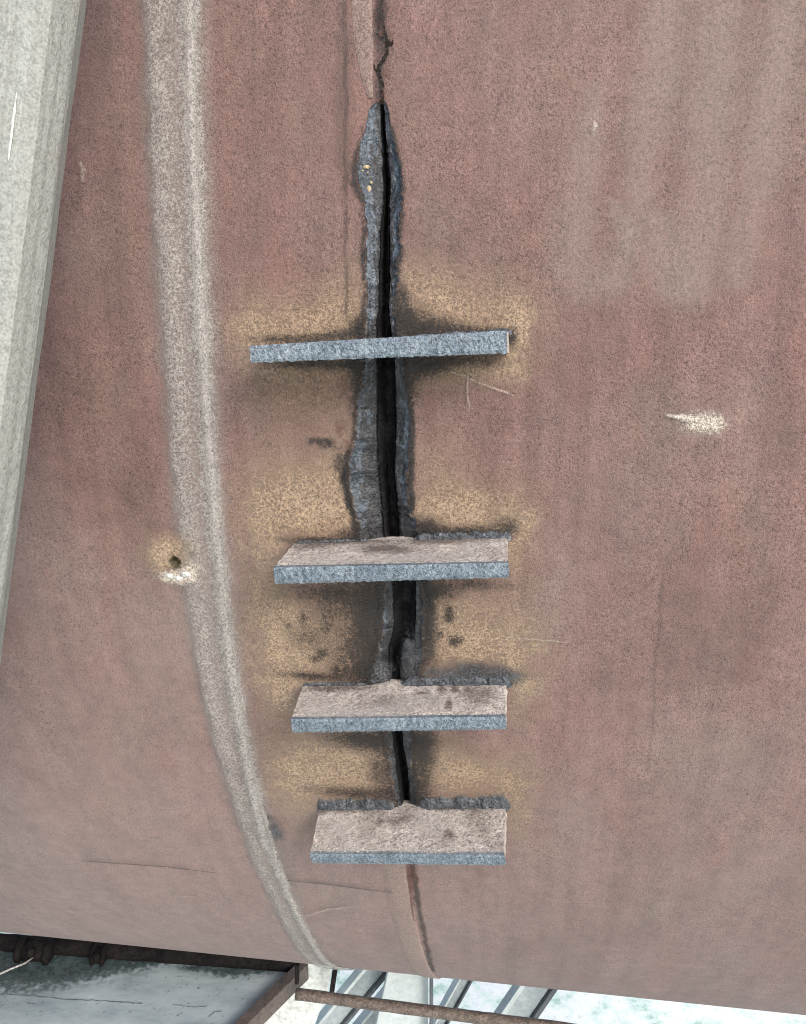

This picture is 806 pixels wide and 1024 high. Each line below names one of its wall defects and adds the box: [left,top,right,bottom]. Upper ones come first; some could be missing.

crack [374,0,400,538]
spalling [149,537,201,585]
crack [389,580,416,682]
crack [392,731,409,804]